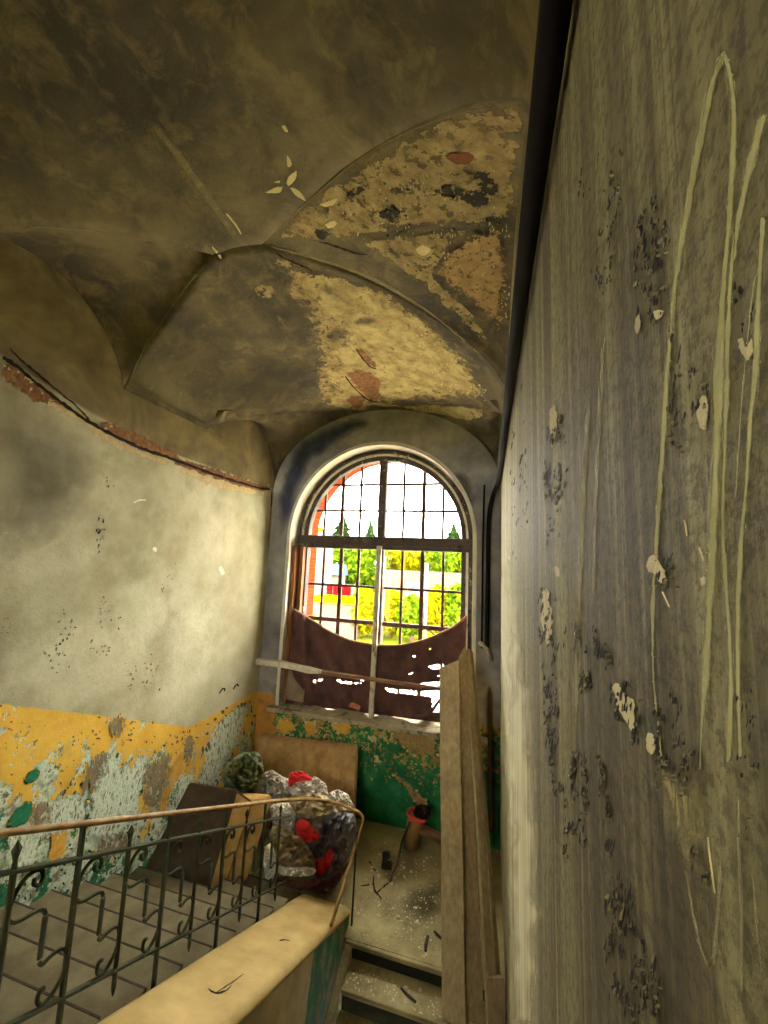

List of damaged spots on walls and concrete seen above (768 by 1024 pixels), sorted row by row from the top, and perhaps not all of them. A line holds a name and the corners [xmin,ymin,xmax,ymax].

peeling [266,104,523,421]
leakage [654,52,766,771]
peeling [4,700,256,900]
peeling [276,715,440,807]
leakage [506,628,538,1021]
peeling [537,587,615,859]
leakage [571,338,605,769]
peeling [609,679,699,797]
leakage [650,574,662,764]
peeling [646,552,679,592]
leakage [661,777,704,846]
leakage [686,869,722,966]